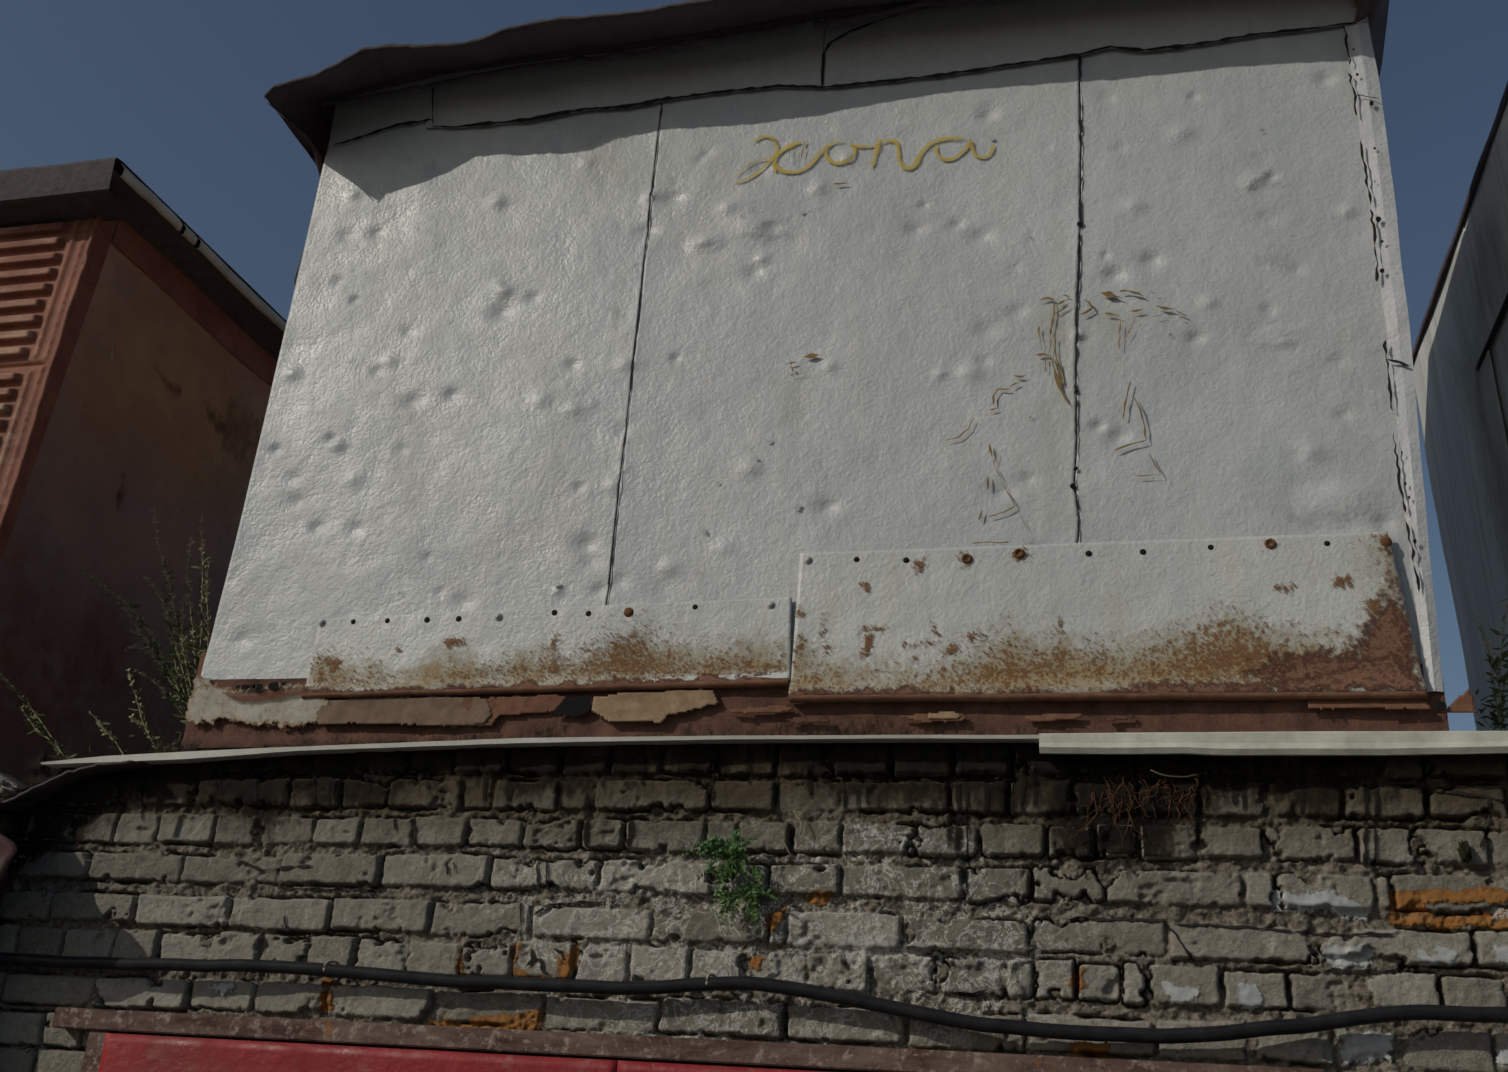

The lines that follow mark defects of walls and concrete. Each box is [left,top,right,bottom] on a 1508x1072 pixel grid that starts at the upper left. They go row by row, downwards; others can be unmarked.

rust [223,534,1427,702]
peeling [184,675,331,730]
leakage [5,716,1401,898]